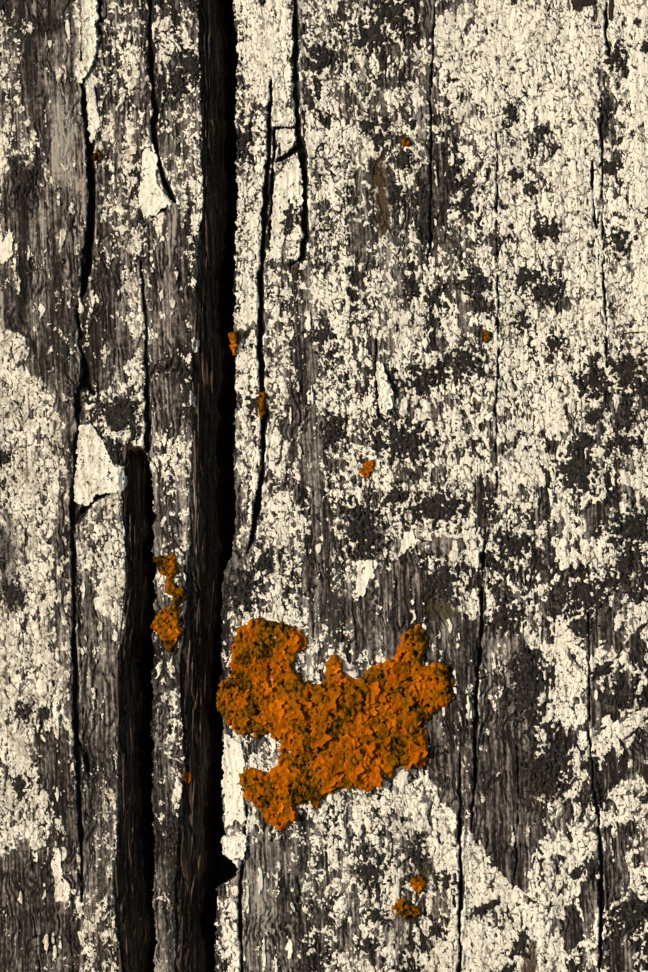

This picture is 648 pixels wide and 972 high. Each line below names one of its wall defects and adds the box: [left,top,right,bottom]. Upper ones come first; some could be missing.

peeling [0,0,130,506]
peeling [138,144,200,435]
crack [69,0,310,972]
peeling [270,158,304,260]
peeling [280,273,333,632]
peeling [376,361,394,414]
peeling [0,718,79,972]
peeling [76,565,124,766]
peeling [221,734,316,972]
peeling [349,530,543,894]
crack [457,542,486,972]
peeling [599,740,648,789]